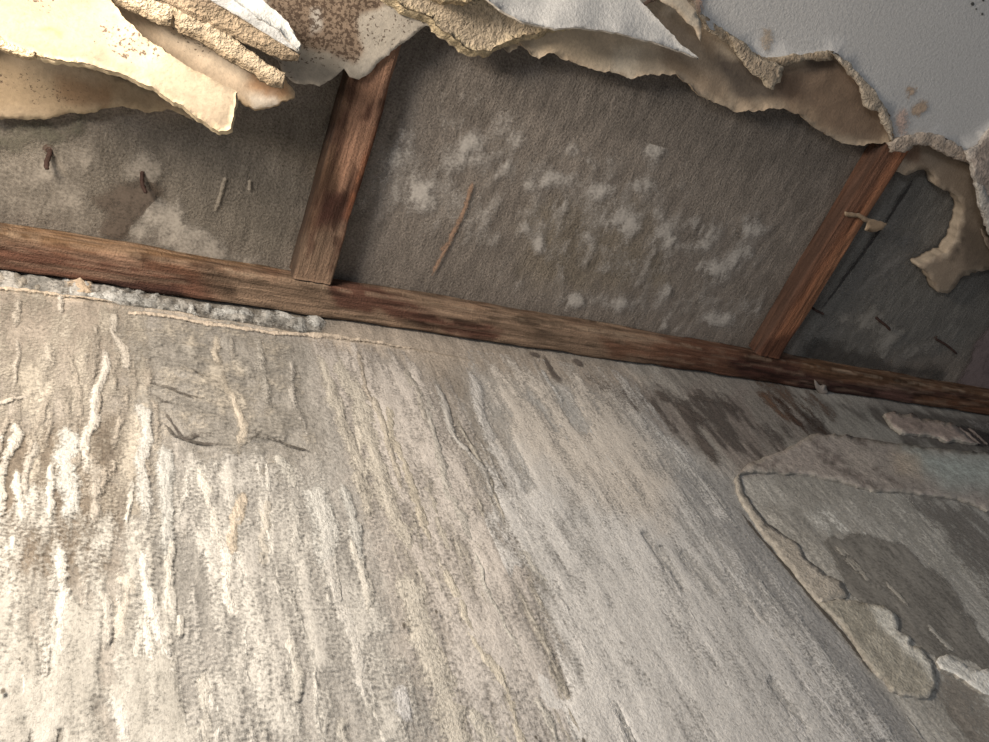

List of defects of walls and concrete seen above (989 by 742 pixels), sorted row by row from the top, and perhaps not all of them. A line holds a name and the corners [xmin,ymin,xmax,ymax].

peeling [640,0,702,42]
damp [379,120,521,213]
damp [524,170,577,191]
damp [645,143,664,160]
spalling [886,132,970,165]
damp [520,200,568,253]
damp [582,177,766,283]
damp [804,304,950,381]
damp [0,270,901,742]
peeling [734,411,989,700]
damp [936,672,989,742]